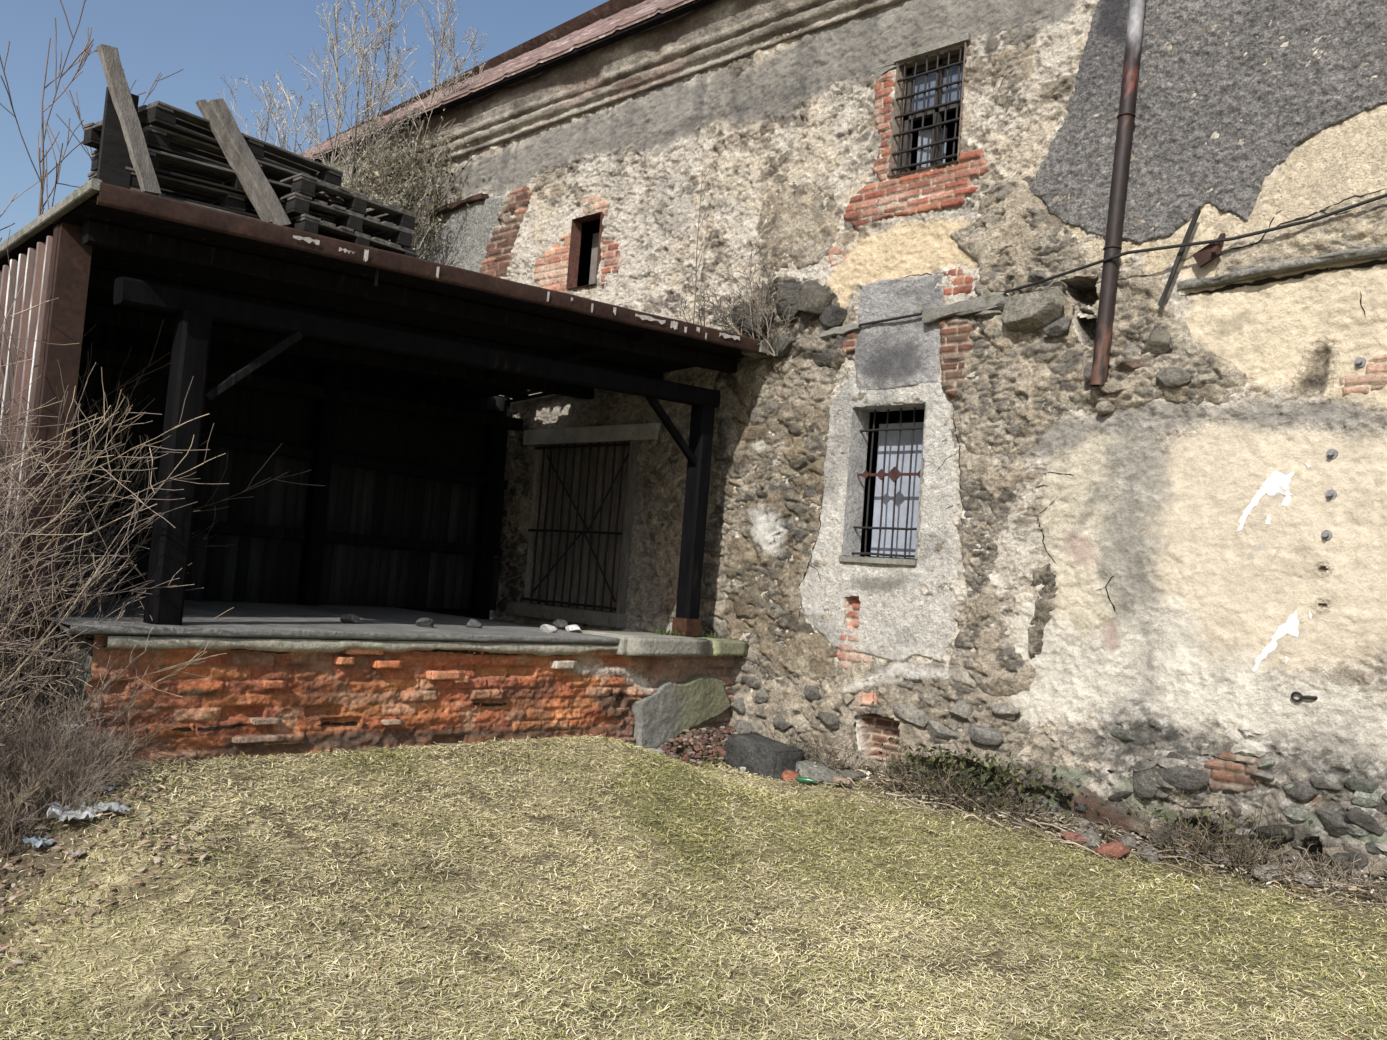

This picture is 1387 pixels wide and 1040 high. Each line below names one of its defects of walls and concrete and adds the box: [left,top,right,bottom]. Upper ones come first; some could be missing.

spalling [581,194,610,220]
spalling [534,233,571,292]
spalling [601,239,622,288]
spalling [699,42,1387,888]